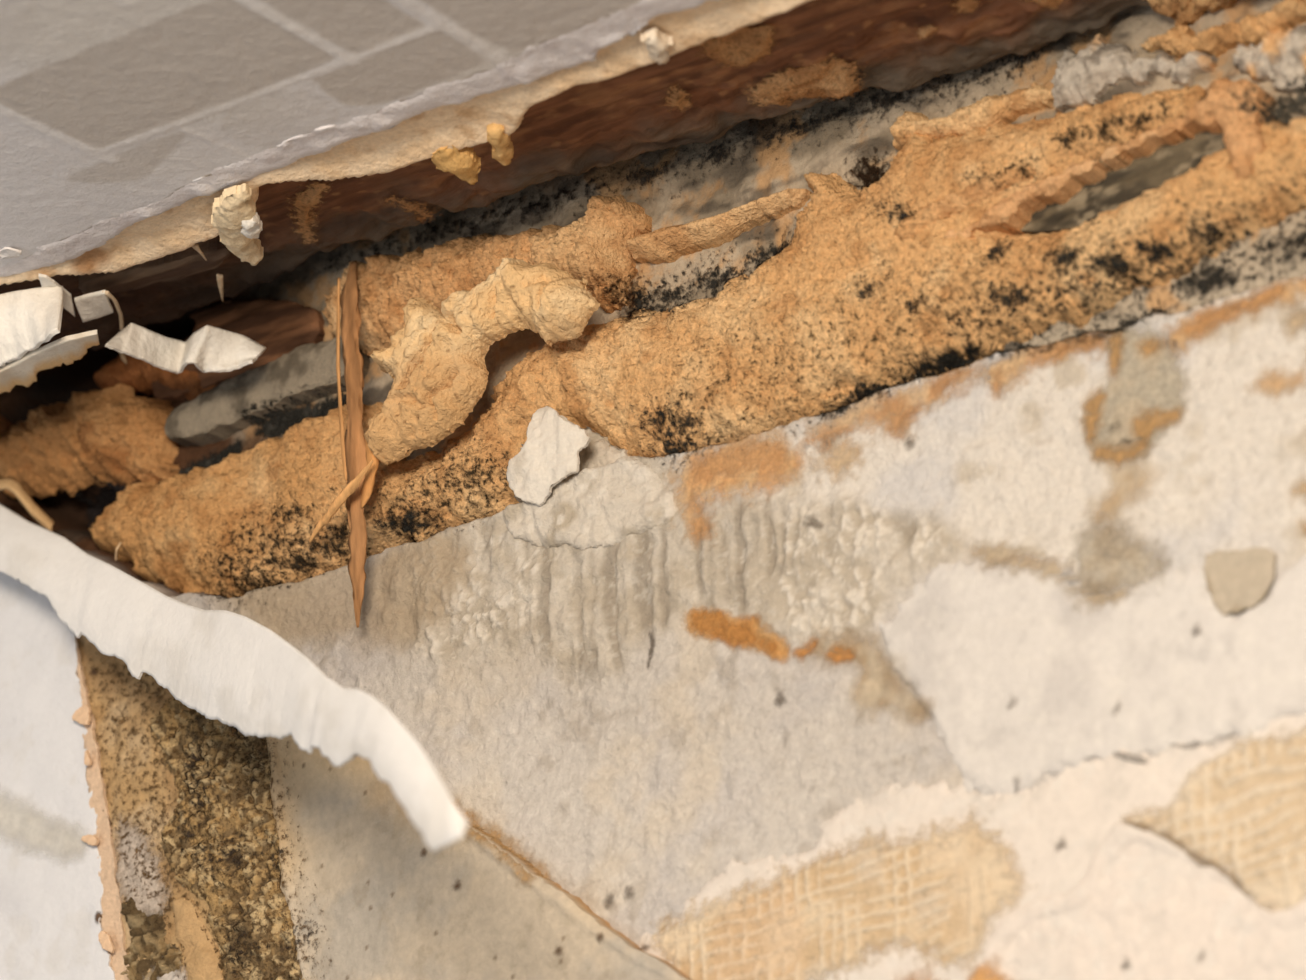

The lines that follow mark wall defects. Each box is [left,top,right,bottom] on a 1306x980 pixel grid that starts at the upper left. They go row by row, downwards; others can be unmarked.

flaking render [0,189,224,285]
flaking render [239,0,810,203]
leakage [314,50,1043,271]
leakage [177,438,242,474]
leakage [196,486,350,610]
leakage [241,384,347,438]
leakage [367,436,509,554]
peeling [503,406,678,550]
leakage [605,155,1306,604]
leakage [84,653,332,980]
peeling [0,504,470,980]
peeling [638,553,1306,980]